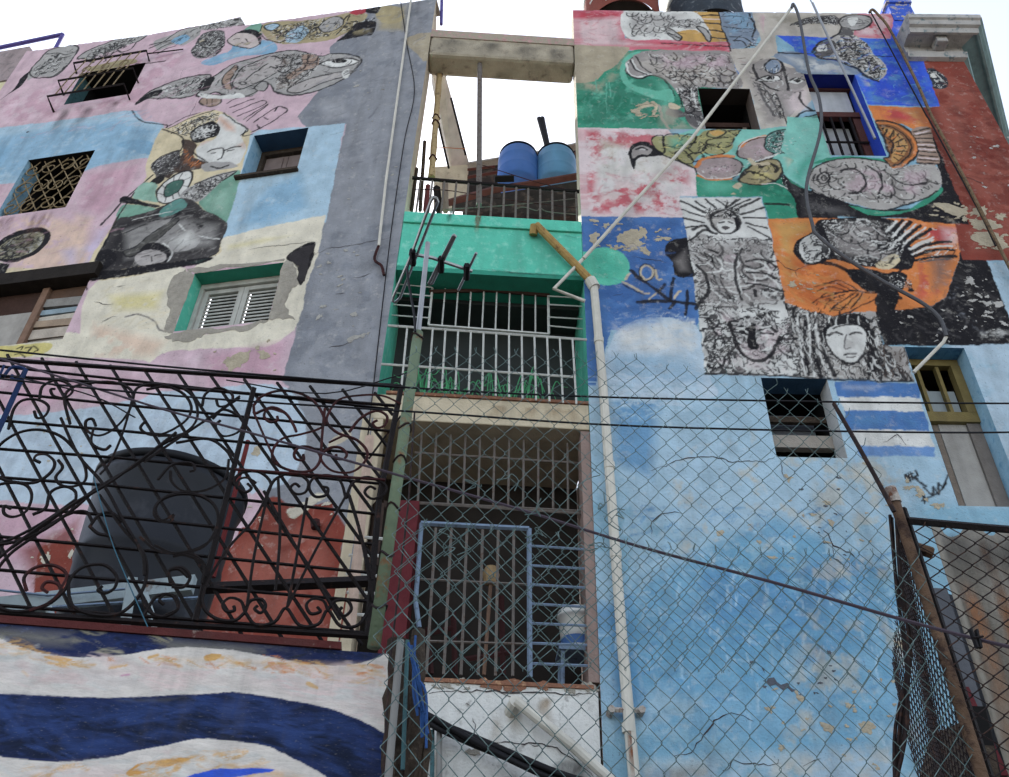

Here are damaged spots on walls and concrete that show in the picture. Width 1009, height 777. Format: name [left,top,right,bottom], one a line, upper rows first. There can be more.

peeling [929,202,1009,250]
spalling [164,244,332,342]
rust [966,592,1002,692]
spalling [750,650,836,702]
crack [675,712,752,756]
spalling [820,690,877,741]